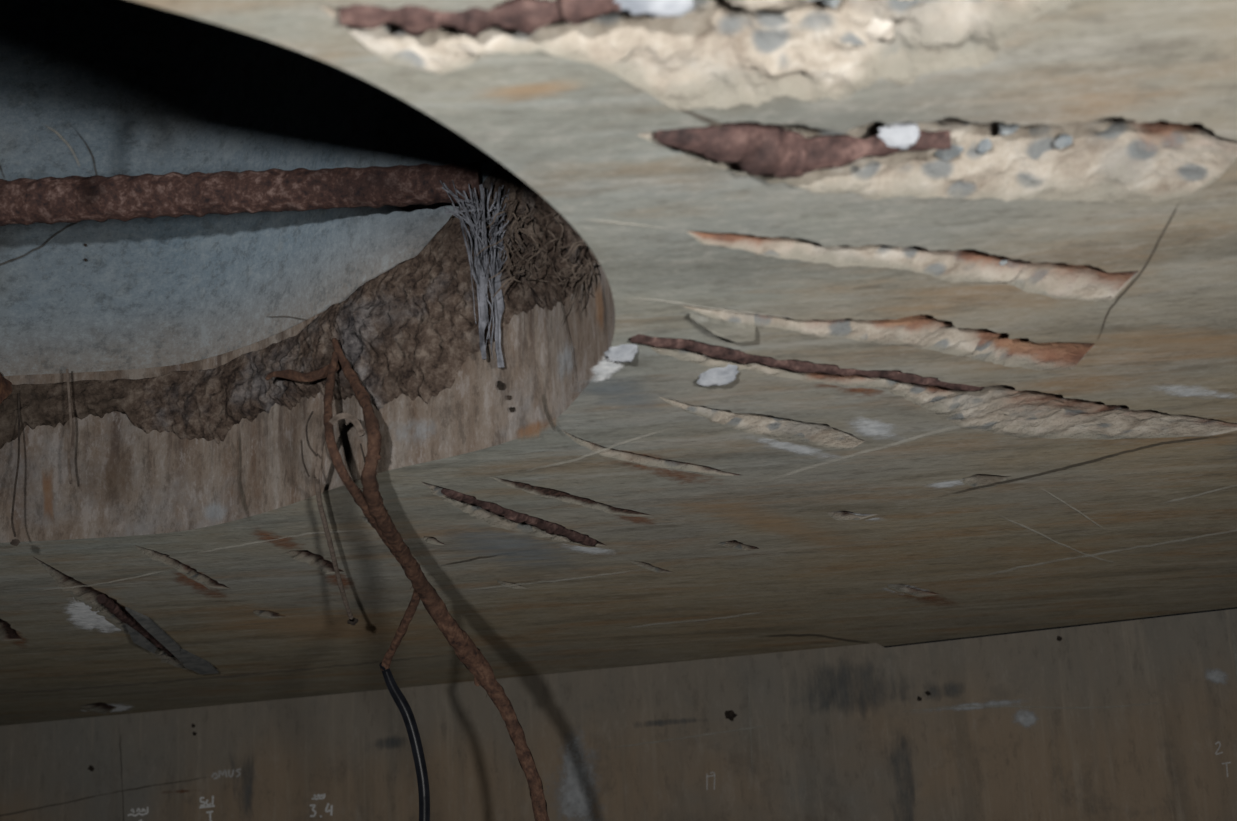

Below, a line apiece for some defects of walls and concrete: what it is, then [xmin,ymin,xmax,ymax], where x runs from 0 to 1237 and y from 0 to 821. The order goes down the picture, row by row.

spalling [318,0,1237,203]
spalling [0,162,482,226]
spalling [686,231,1139,303]
spalling [0,373,13,404]
spalling [497,380,515,412]
spalling [659,397,865,449]
spalling [604,305,1237,440]
spalling [420,481,607,547]
spalling [0,619,22,641]
spalling [32,556,218,675]